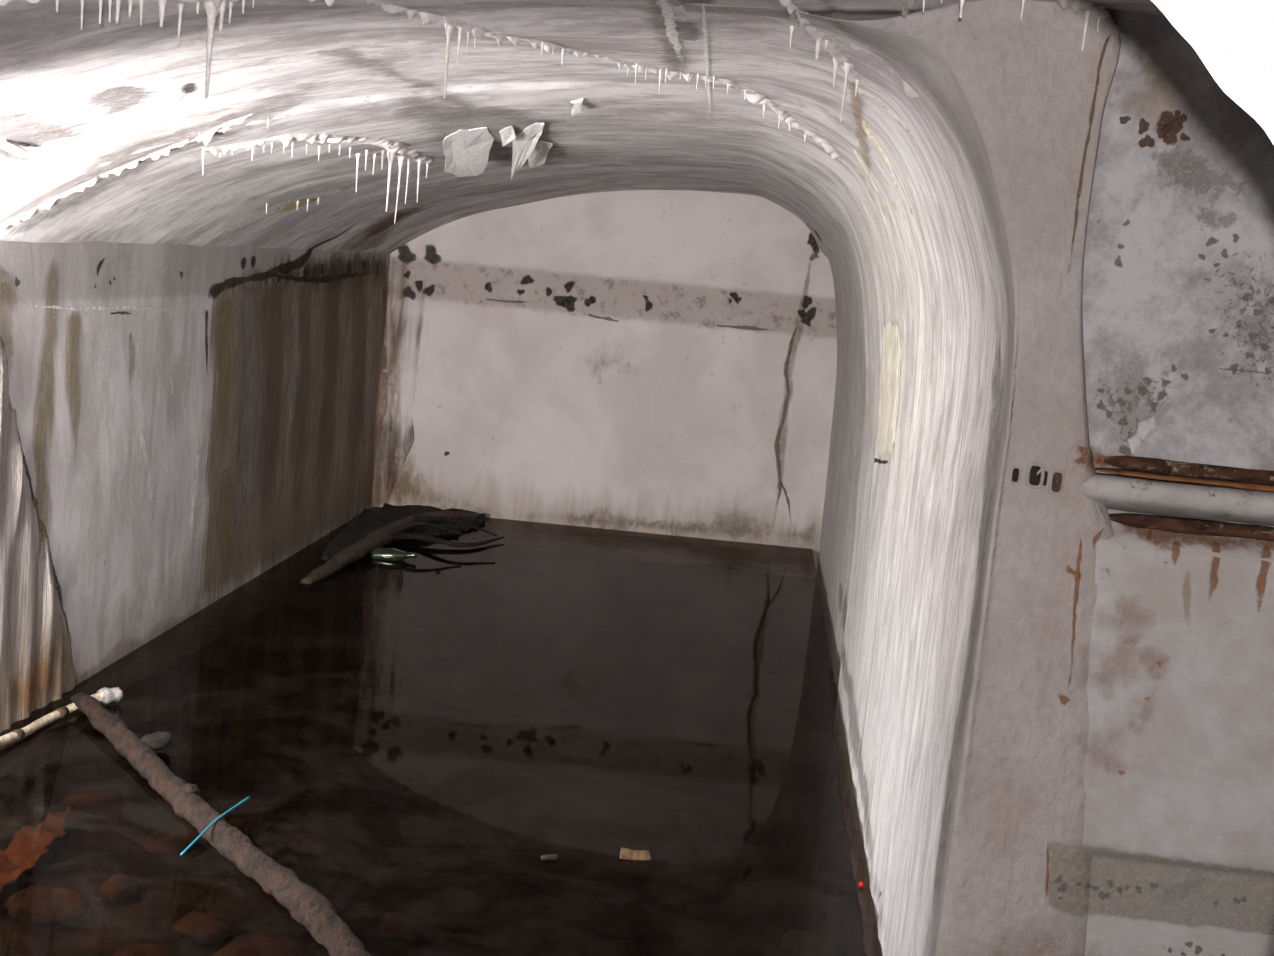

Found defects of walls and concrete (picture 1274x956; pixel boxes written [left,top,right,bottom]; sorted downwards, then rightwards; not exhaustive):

efflorescence [99,0,255,99]
efflorescence [0,113,433,234]
peeling [443,122,553,180]
efflorescence [364,0,919,218]
spalling [1120,110,1244,197]
peeling [1198,209,1274,386]
leakage [190,245,441,601]
crack [775,329,796,513]
peeling [1094,365,1189,456]
crack [9,405,70,634]
corrosion [1066,530,1103,655]
corrosion [1123,525,1274,606]